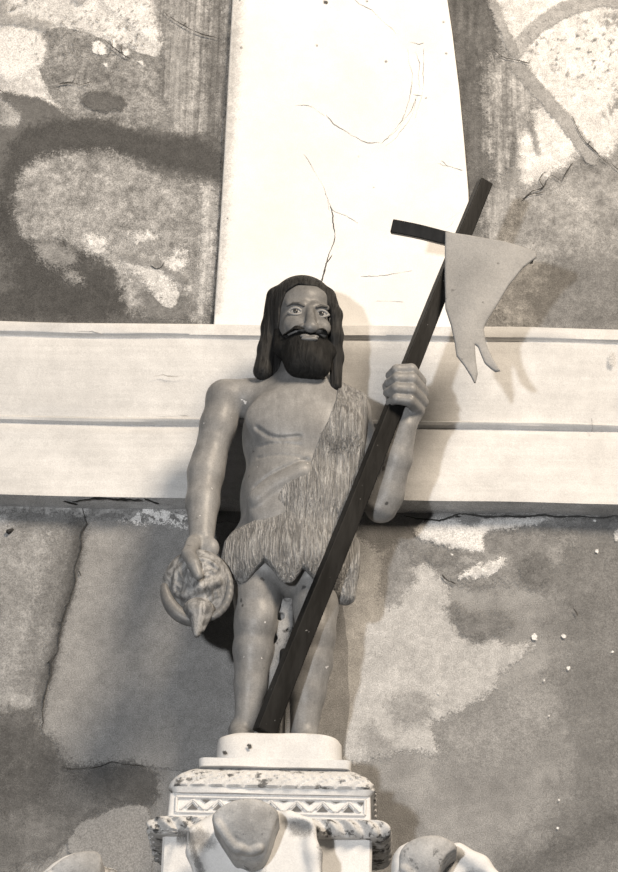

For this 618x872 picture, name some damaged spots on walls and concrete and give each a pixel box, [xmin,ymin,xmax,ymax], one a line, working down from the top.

water stain [0,0,225,324]
crack [523,163,572,199]
crack [572,117,618,169]
crack [404,513,618,521]
crack [35,497,159,728]
water stain [425,522,618,872]
water stain [0,707,160,872]